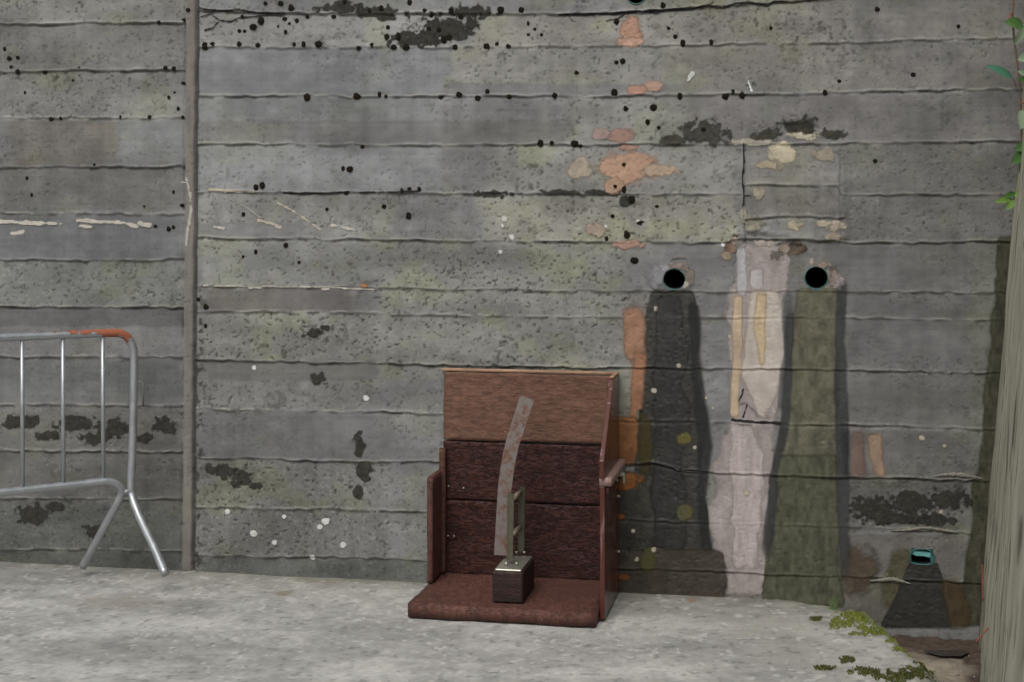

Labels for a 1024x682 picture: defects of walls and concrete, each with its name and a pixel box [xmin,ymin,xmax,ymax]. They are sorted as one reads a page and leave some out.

crack [742,143,751,228]
peeling [728,131,834,170]
corrosion [619,308,646,491]
water stain [619,242,977,607]
water stain [881,550,970,628]